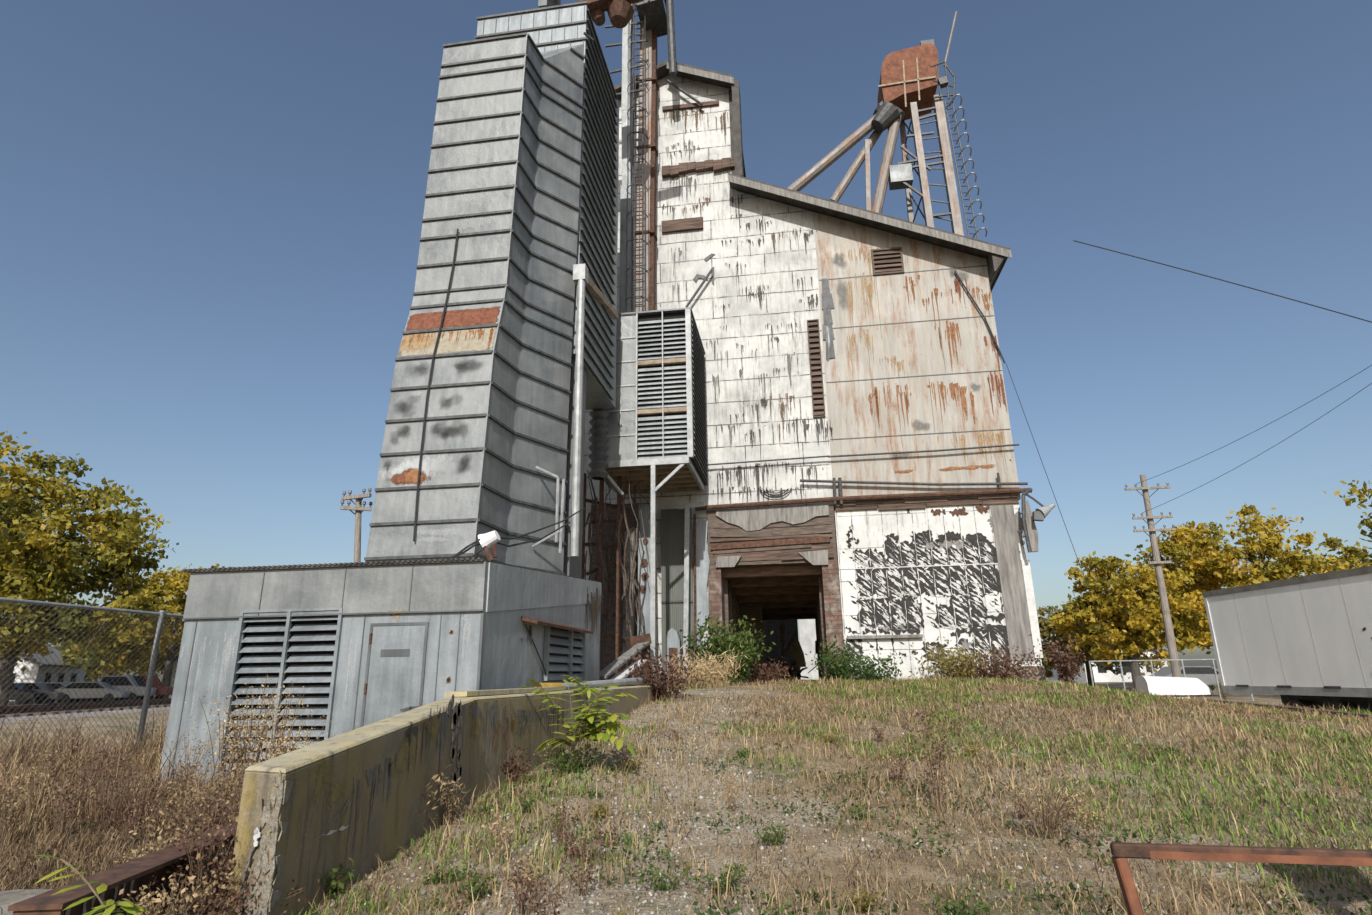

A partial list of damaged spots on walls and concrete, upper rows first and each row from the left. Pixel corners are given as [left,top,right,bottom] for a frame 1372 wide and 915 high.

leakage [658,106,728,217]
rust [399,306,500,356]
leakage [671,248,684,303]
leakage [706,194,833,507]
leakage [838,283,846,305]
rust [836,247,911,439]
rust [904,275,1011,471]
rust [383,455,444,486]
peeling [843,504,1010,666]
peeling [1014,511,1025,547]
spalling [246,770,293,915]
leakage [344,700,564,873]